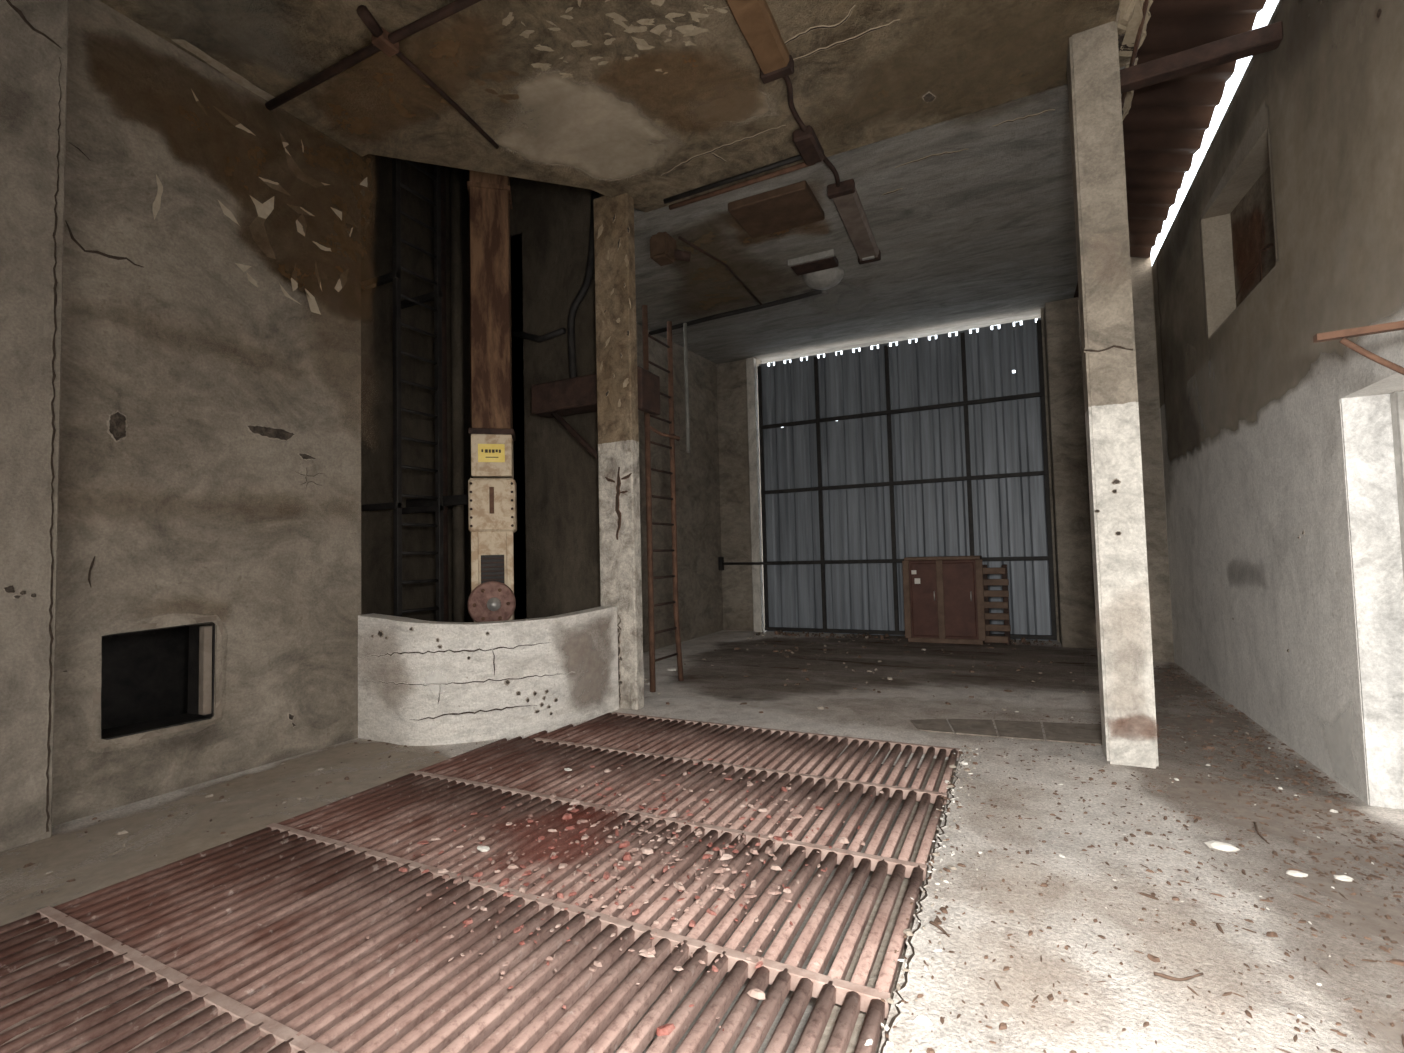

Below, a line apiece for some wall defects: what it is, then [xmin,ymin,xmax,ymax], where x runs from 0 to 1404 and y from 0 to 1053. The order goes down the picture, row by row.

spalling [107,410,128,442]
crack [605,467,632,540]
spalling [3,585,37,599]
crack [358,641,575,721]
leakage [561,618,610,705]